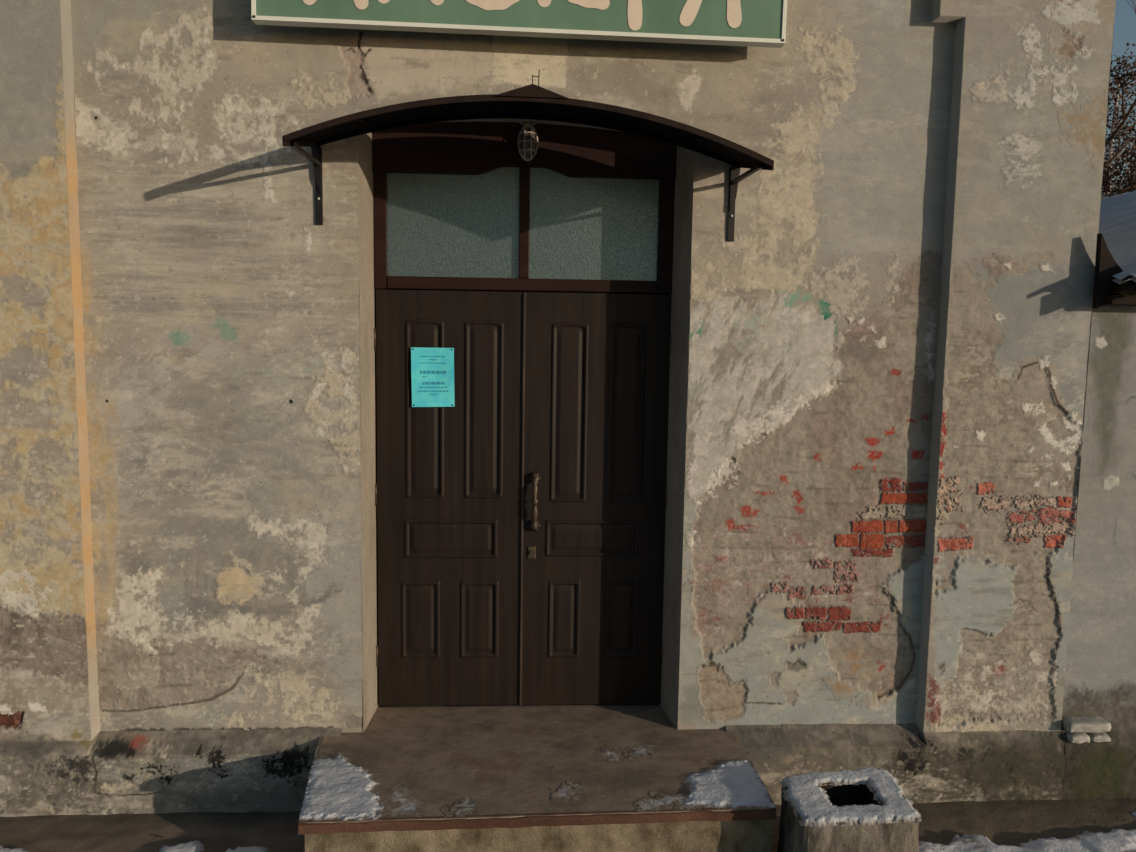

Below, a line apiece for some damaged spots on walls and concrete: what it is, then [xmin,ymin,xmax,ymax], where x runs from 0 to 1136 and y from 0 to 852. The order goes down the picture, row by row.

peeling [0,0,375,731]
spalling [685,23,1083,733]
crack [1017,359,1070,415]
crack [101,663,336,731]
leakage [0,723,180,788]
crack [90,753,165,797]
leakage [192,734,234,780]
leakage [258,741,316,786]
leakage [894,727,964,779]
leakage [1061,678,1136,799]